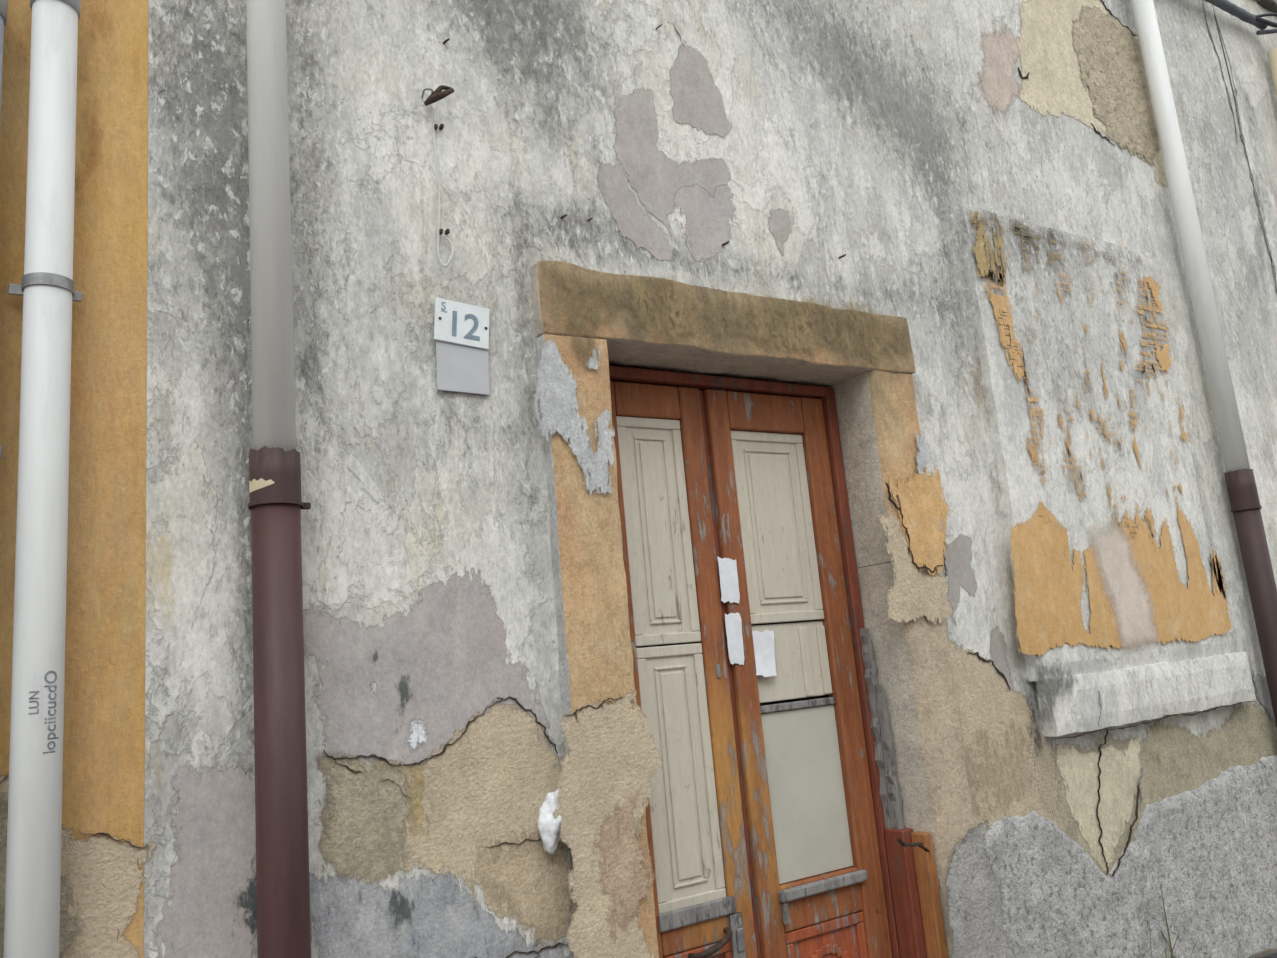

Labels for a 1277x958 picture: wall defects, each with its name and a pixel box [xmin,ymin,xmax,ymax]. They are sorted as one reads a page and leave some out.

peeling [598,88,736,263]
peeling [670,44,732,137]
spalling [979,0,1168,187]
crack [1202,0,1277,292]
peeling [533,338,615,496]
peeling [857,210,1277,958]
spalling [59,825,156,958]
peeling [154,762,257,958]
crack [323,696,622,797]
spalling [303,568,662,958]
crack [474,848,573,958]
crack [1051,691,1256,877]